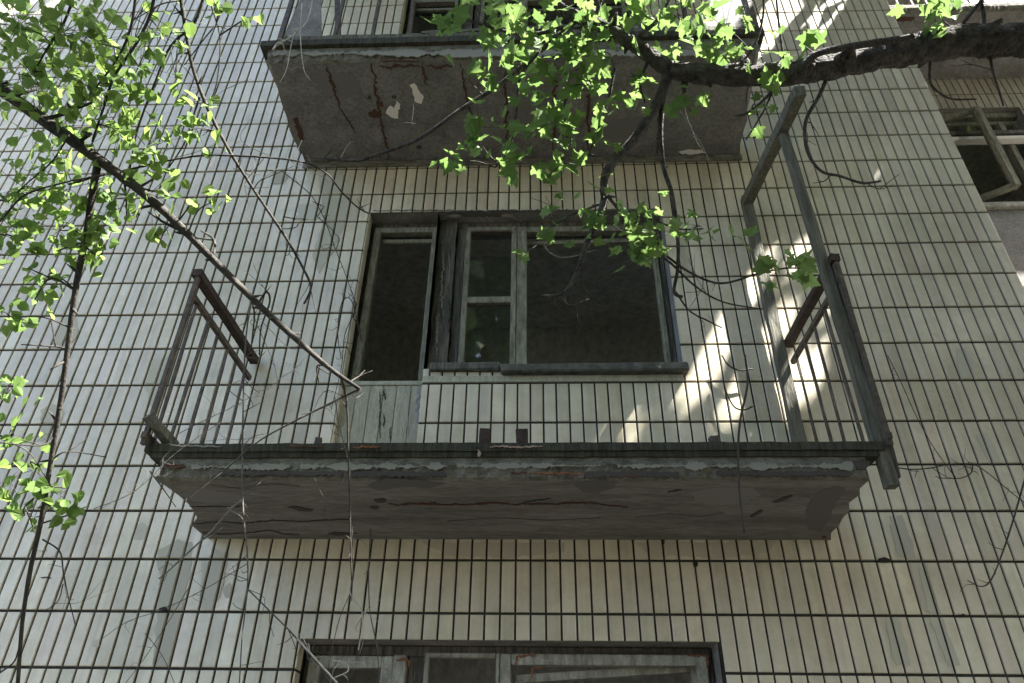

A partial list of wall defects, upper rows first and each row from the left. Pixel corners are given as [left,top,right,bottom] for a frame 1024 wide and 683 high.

peeling [410,83,424,104]
peeling [386,95,400,119]
peeling [163,461,601,472]
crack [389,489,724,521]